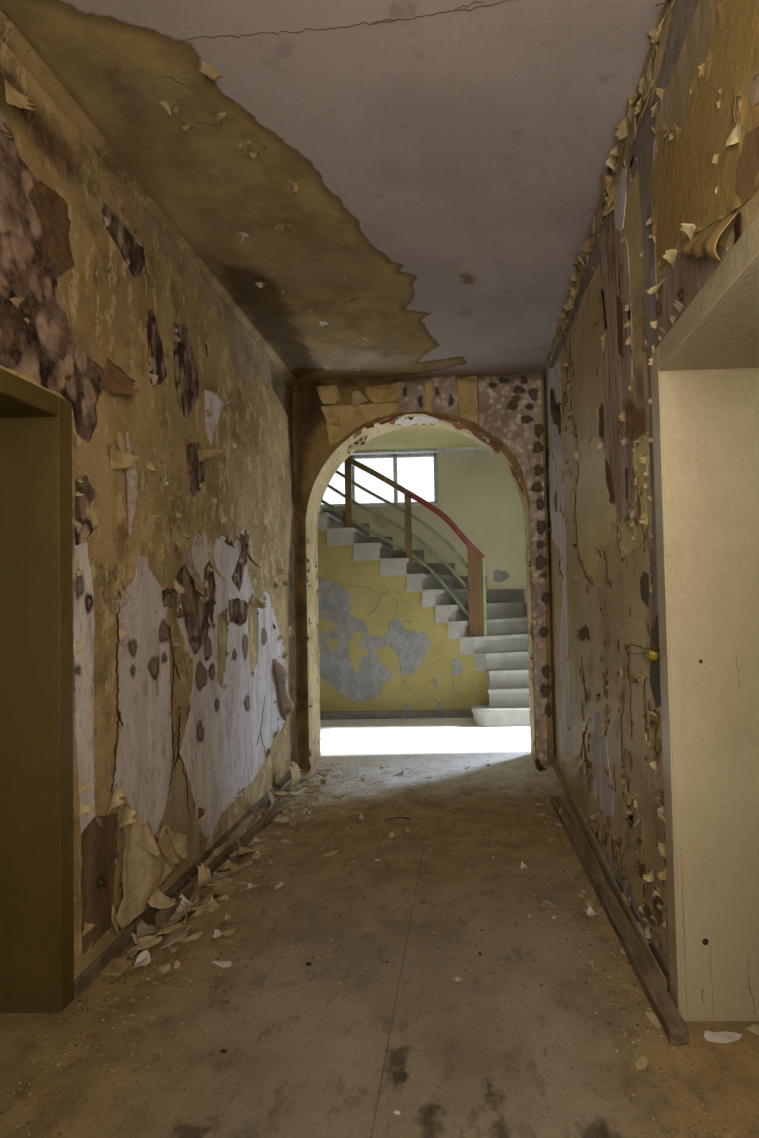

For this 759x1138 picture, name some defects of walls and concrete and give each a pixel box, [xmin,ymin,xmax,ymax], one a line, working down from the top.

crack [185,0,513,41]
peeling [28,181,75,275]
peeling [100,200,147,278]
peeling [101,308,294,862]
peeling [307,558,432,703]
peeling [493,569,510,583]
peeling [73,475,119,955]